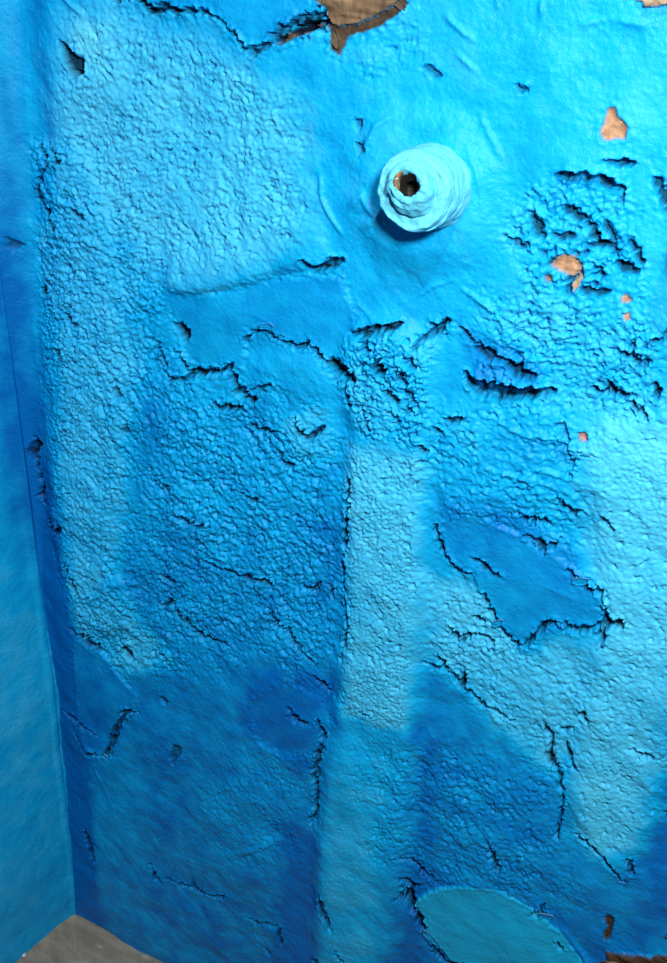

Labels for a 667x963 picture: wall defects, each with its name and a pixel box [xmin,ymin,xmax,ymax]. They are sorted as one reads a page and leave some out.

crack [112,0,332,59]
flaking render [274,0,408,57]
flaking render [637,0,667,8]
peeling [599,106,628,143]
crack [554,157,638,209]
crack [154,317,558,470]
crack [589,328,667,421]
crack [269,477,352,692]
crack [420,421,626,723]
crack [542,710,635,885]
peeling [415,885,583,963]
flaking render [600,915,667,963]